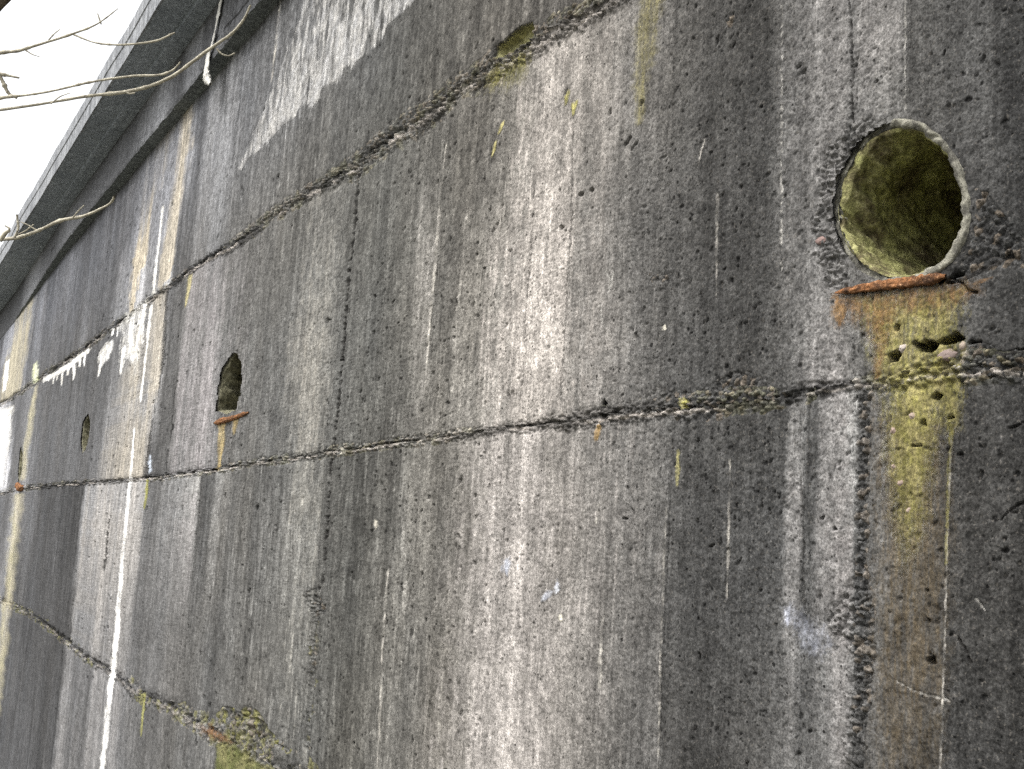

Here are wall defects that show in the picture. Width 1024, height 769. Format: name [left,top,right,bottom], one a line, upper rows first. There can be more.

damp [0,43,264,769]
rust [213,412,248,470]
crack [0,0,606,590]
damp [402,0,678,769]
crack [600,271,614,322]
crack [584,348,1024,424]
damp [771,0,911,769]
rust [833,273,947,325]
damp [881,383,932,697]